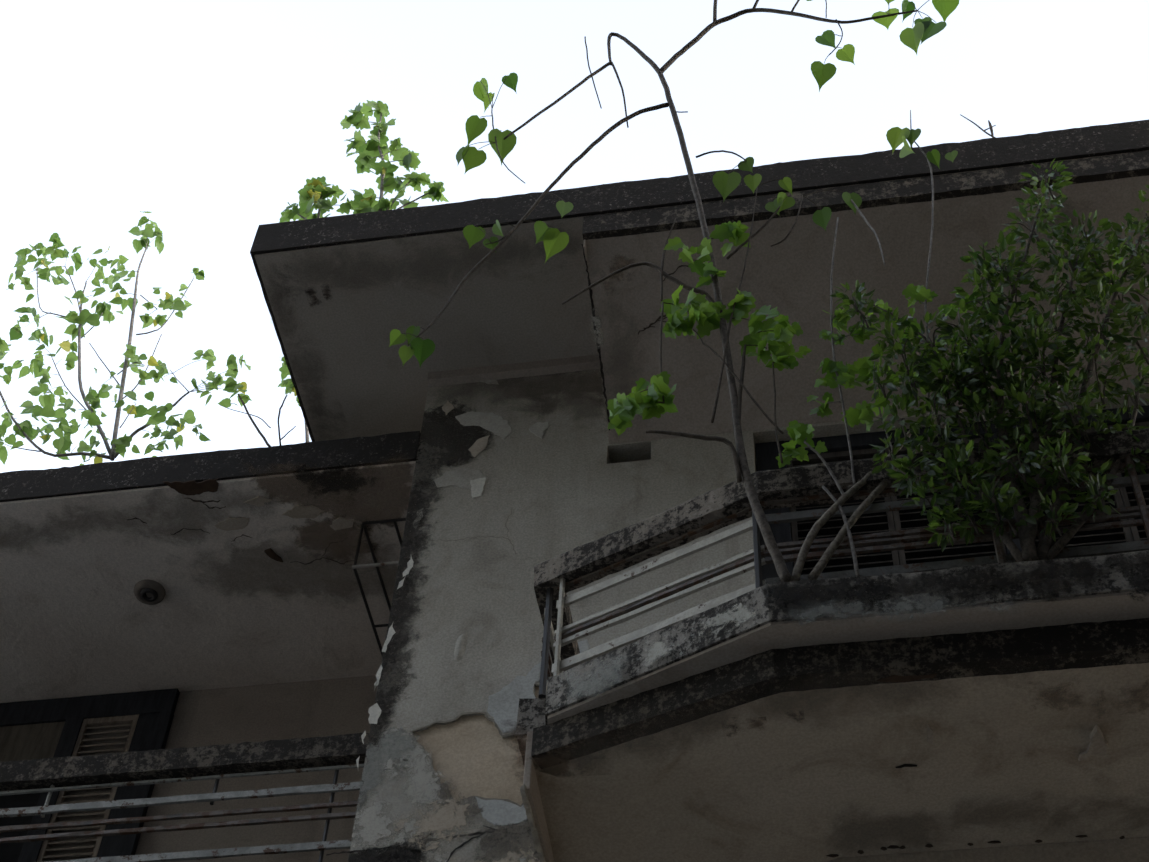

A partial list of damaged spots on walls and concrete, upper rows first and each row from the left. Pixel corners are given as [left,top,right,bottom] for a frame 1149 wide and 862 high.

crack [638,314,667,335]
peeling [433,400,512,500]
peeling [397,556,414,589]
damp [761,551,1149,623]
damp [249,400,492,862]
damp [699,603,757,638]
damp [645,641,674,665]
peeling [356,623,396,769]
damp [567,656,623,698]
peeling [410,654,552,826]
damp [488,820,538,862]